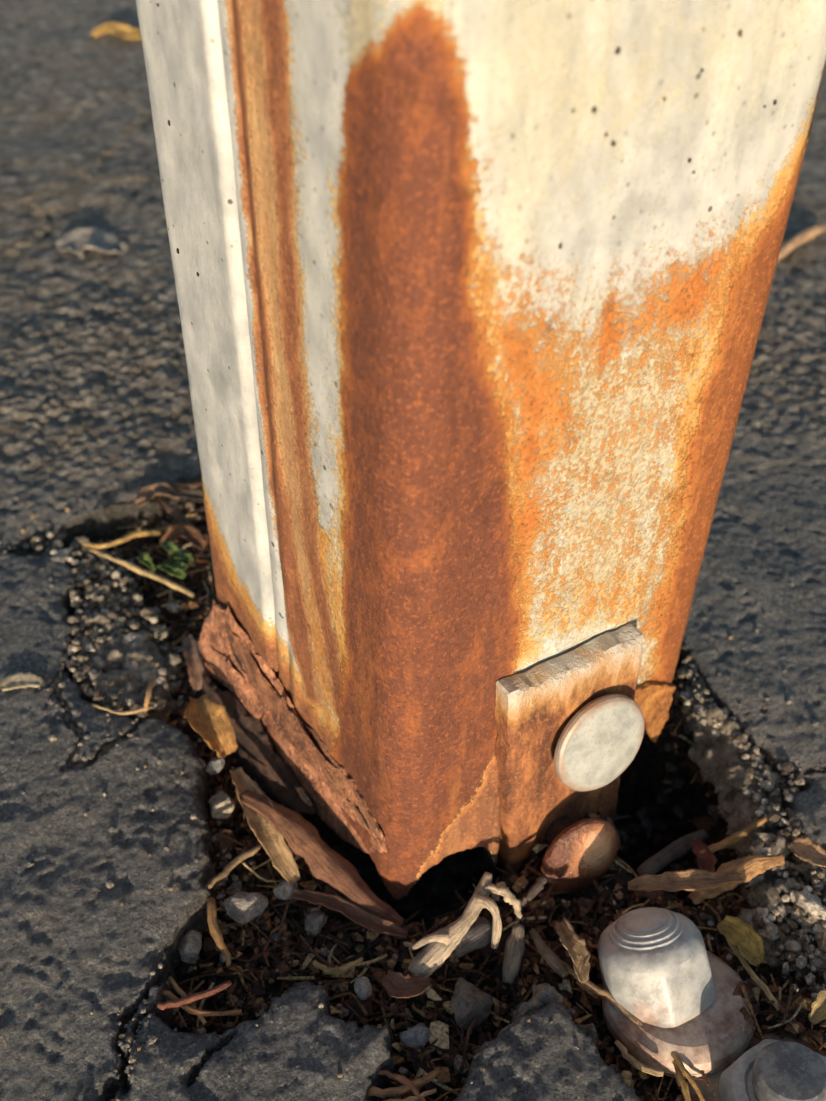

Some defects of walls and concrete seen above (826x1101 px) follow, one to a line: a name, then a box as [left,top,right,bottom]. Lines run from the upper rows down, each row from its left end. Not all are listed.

corrosion [196,0,826,899]
crack [105,972,168,1101]
crack [189,1037,231,1083]